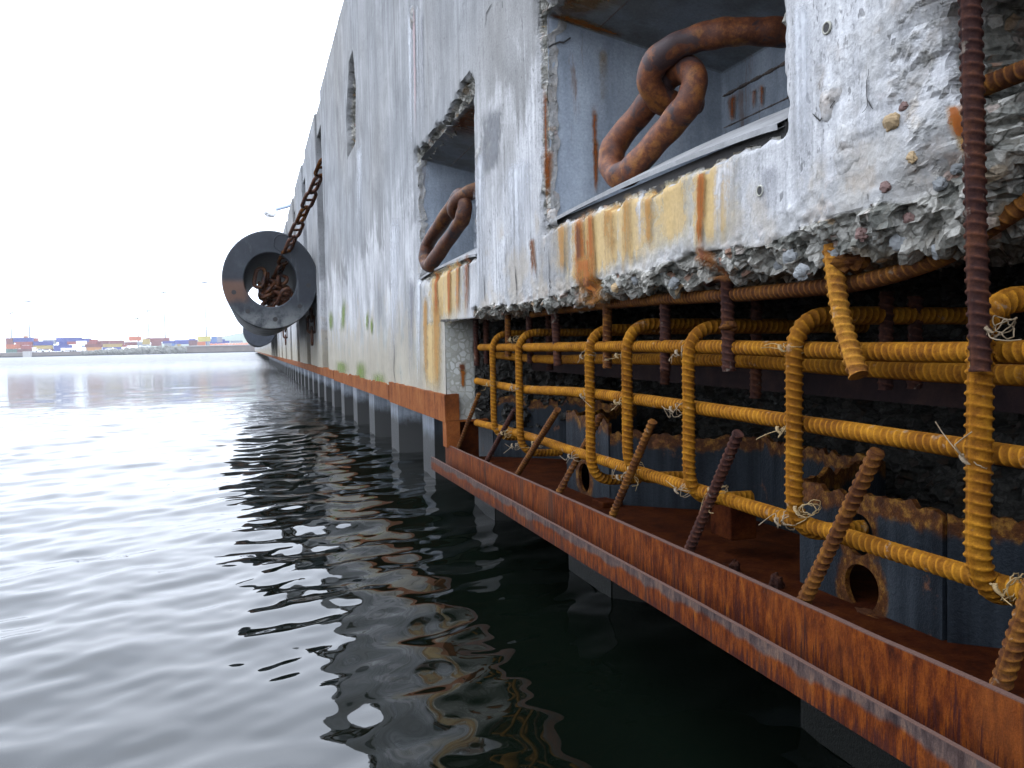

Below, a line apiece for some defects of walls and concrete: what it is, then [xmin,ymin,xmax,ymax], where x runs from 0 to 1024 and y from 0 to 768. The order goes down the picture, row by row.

spalling [347,65,356,156]
spalling [417,71,475,160]
corrosion [423,256,472,385]
corrosion [557,161,733,302]
spalling [471,0,1024,552]
spalling [796,432,966,604]
spalling [989,579,1024,693]